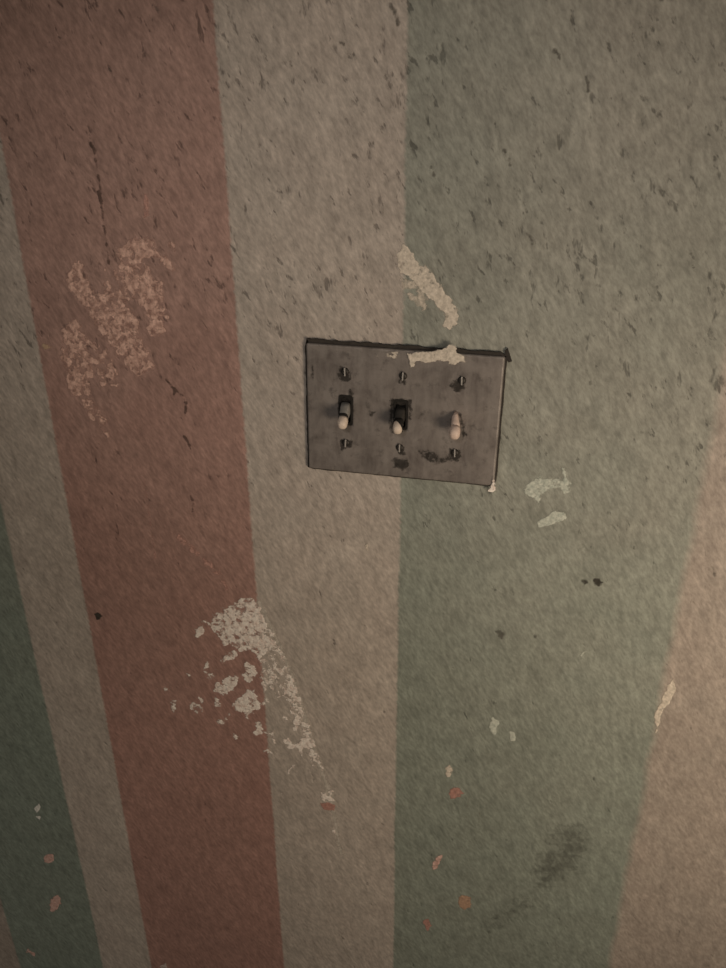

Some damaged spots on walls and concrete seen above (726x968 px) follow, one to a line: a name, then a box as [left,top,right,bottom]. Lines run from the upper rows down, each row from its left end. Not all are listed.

peeling [397,244,459,330]
peeling [42,237,175,438]
peeling [524,468,572,503]
peeling [537,511,567,528]
peeling [190,598,324,774]